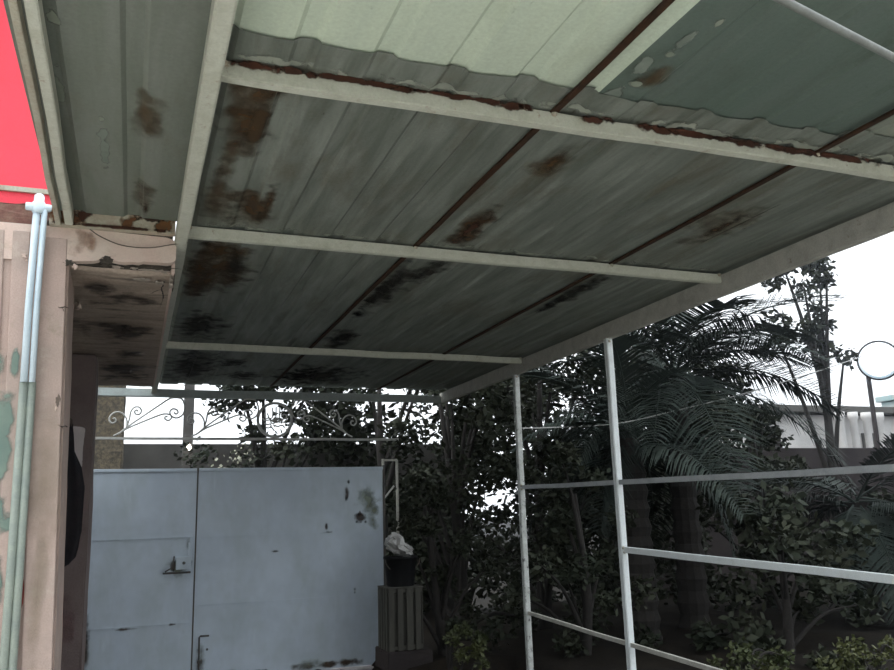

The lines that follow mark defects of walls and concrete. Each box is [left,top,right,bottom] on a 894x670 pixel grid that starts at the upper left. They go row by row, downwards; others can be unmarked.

corrosion [230,60,533,111]
peeling [603,57,654,97]
corrosion [137,107,160,134]
corrosion [582,116,614,125]
corrosion [207,85,285,222]
corrosion [530,156,566,175]
corrosion [637,124,881,166]
corrosion [47,185,174,233]
corrosion [446,210,497,244]
damp [85,285,154,304]
damp [364,492,377,527]
corrosion [293,659,360,669]